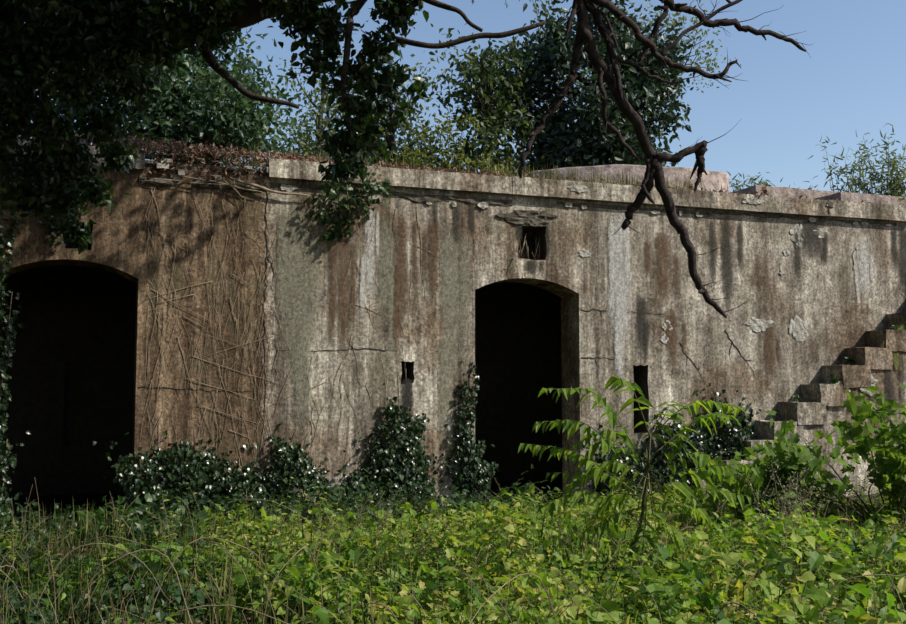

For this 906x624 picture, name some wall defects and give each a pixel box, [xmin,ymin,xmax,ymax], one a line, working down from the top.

crack [138,191,397,463]
damp [360,209,395,352]
damp [439,202,474,431]
damp [710,219,744,300]
damp [795,221,828,277]